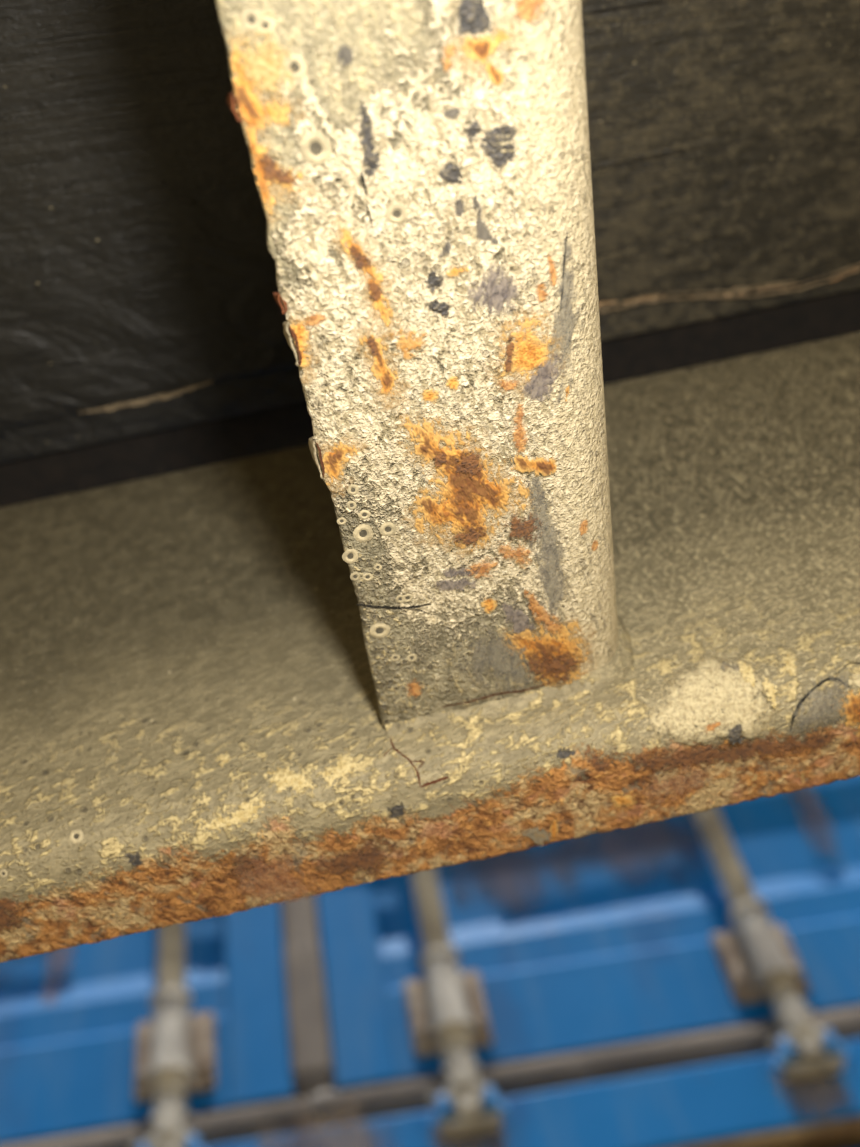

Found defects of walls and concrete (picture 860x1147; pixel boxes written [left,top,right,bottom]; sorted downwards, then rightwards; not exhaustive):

corrosion [230,32,303,214]
corrosion [537,256,557,302]
corrosion [423,377,459,402]
corrosion [499,316,551,391]
corrosion [403,404,557,578]
corrosion [505,591,589,687]
crack [790,662,860,731]
crack [384,737,449,787]
corrosion [0,690,860,963]